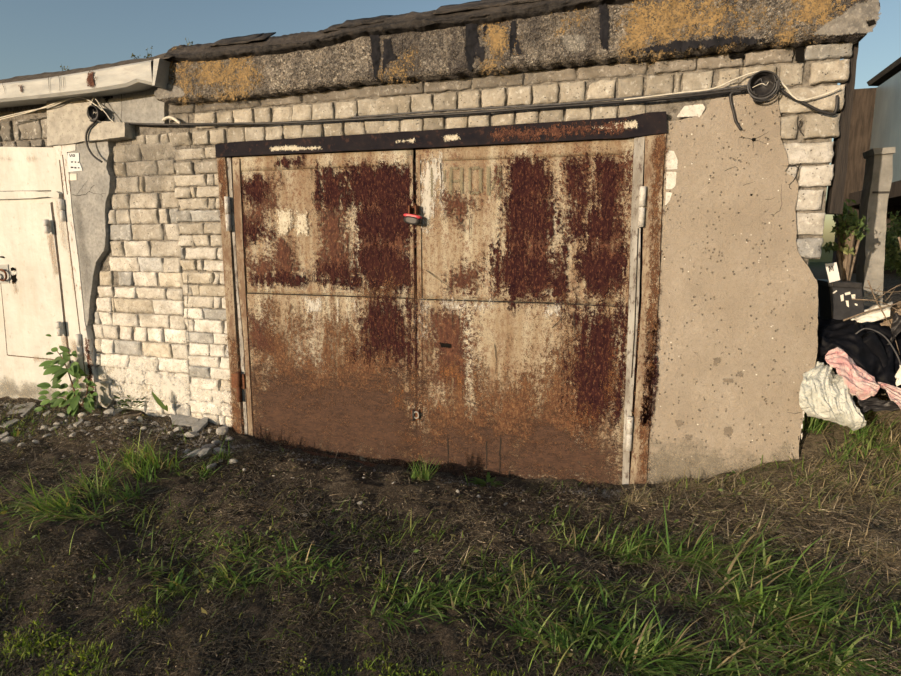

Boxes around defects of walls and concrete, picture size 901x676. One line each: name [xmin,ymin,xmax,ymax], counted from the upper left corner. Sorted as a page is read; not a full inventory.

water stain [382,37,397,74]
water stain [473,46,485,63]
flaking render [677,104,705,117]
corrosion [487,119,629,143]
flaking render [665,150,678,205]
corrosion [637,134,668,483]
corrosion [225,336,245,434]